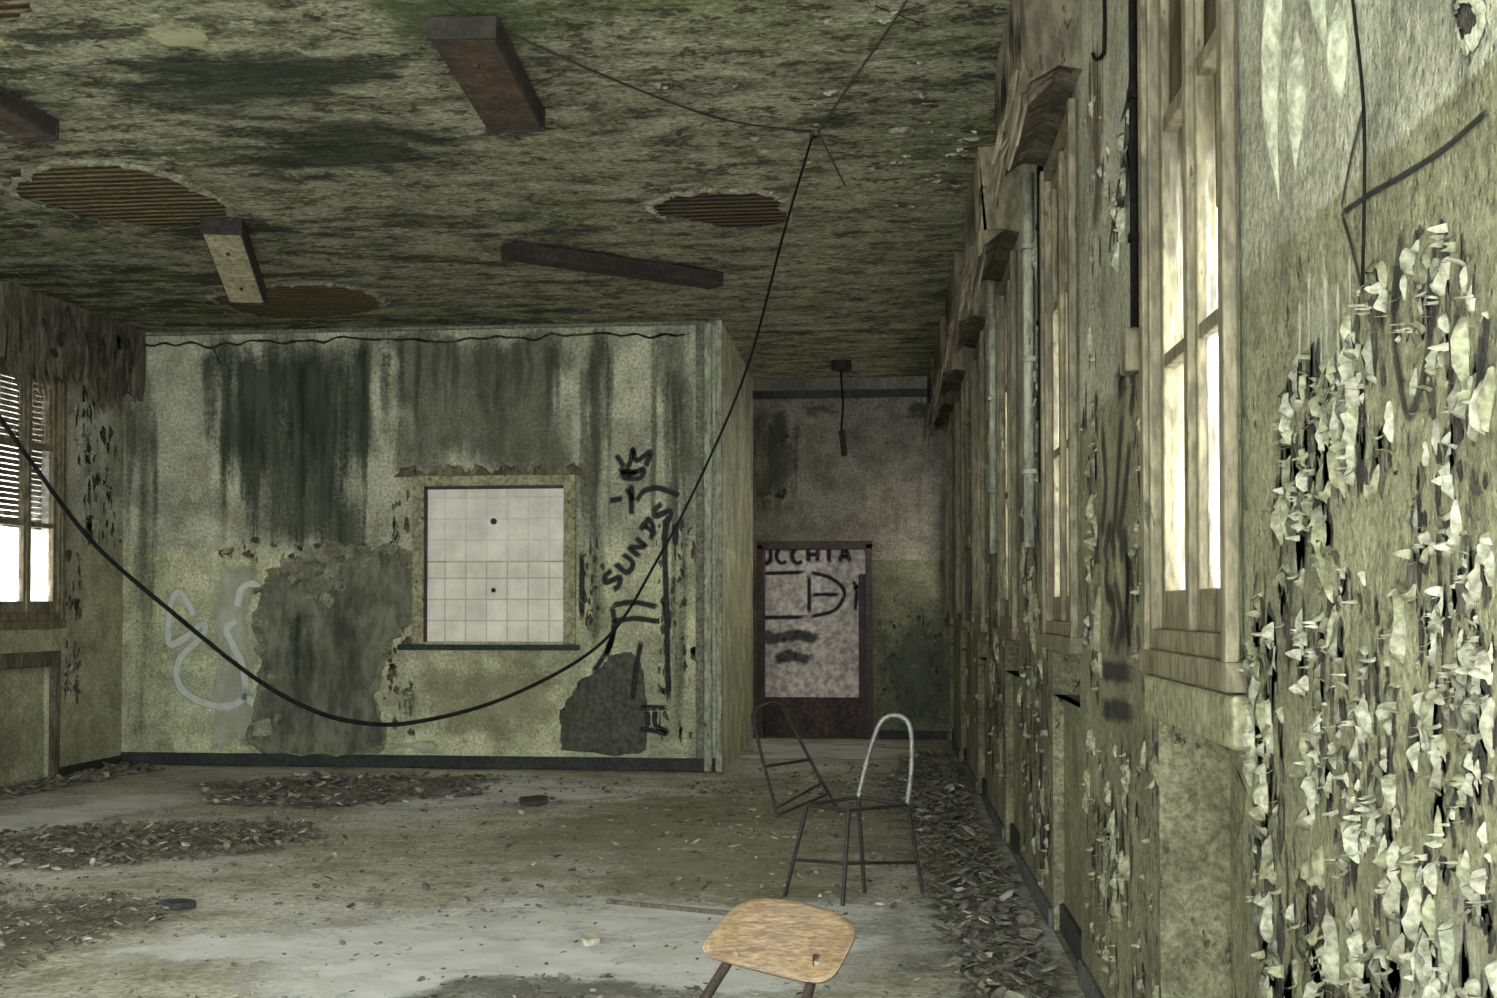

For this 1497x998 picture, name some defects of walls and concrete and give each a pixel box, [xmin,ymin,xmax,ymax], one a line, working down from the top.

peeling [0,0,86,25]
peeling [4,160,239,229]
leakage [82,0,585,113]
leakage [217,120,464,181]
peeling [640,186,795,231]
peeling [686,51,985,196]
leakage [203,330,564,548]
leakage [581,330,611,638]
peeling [1079,89,1129,706]
peeling [1237,218,1497,998]